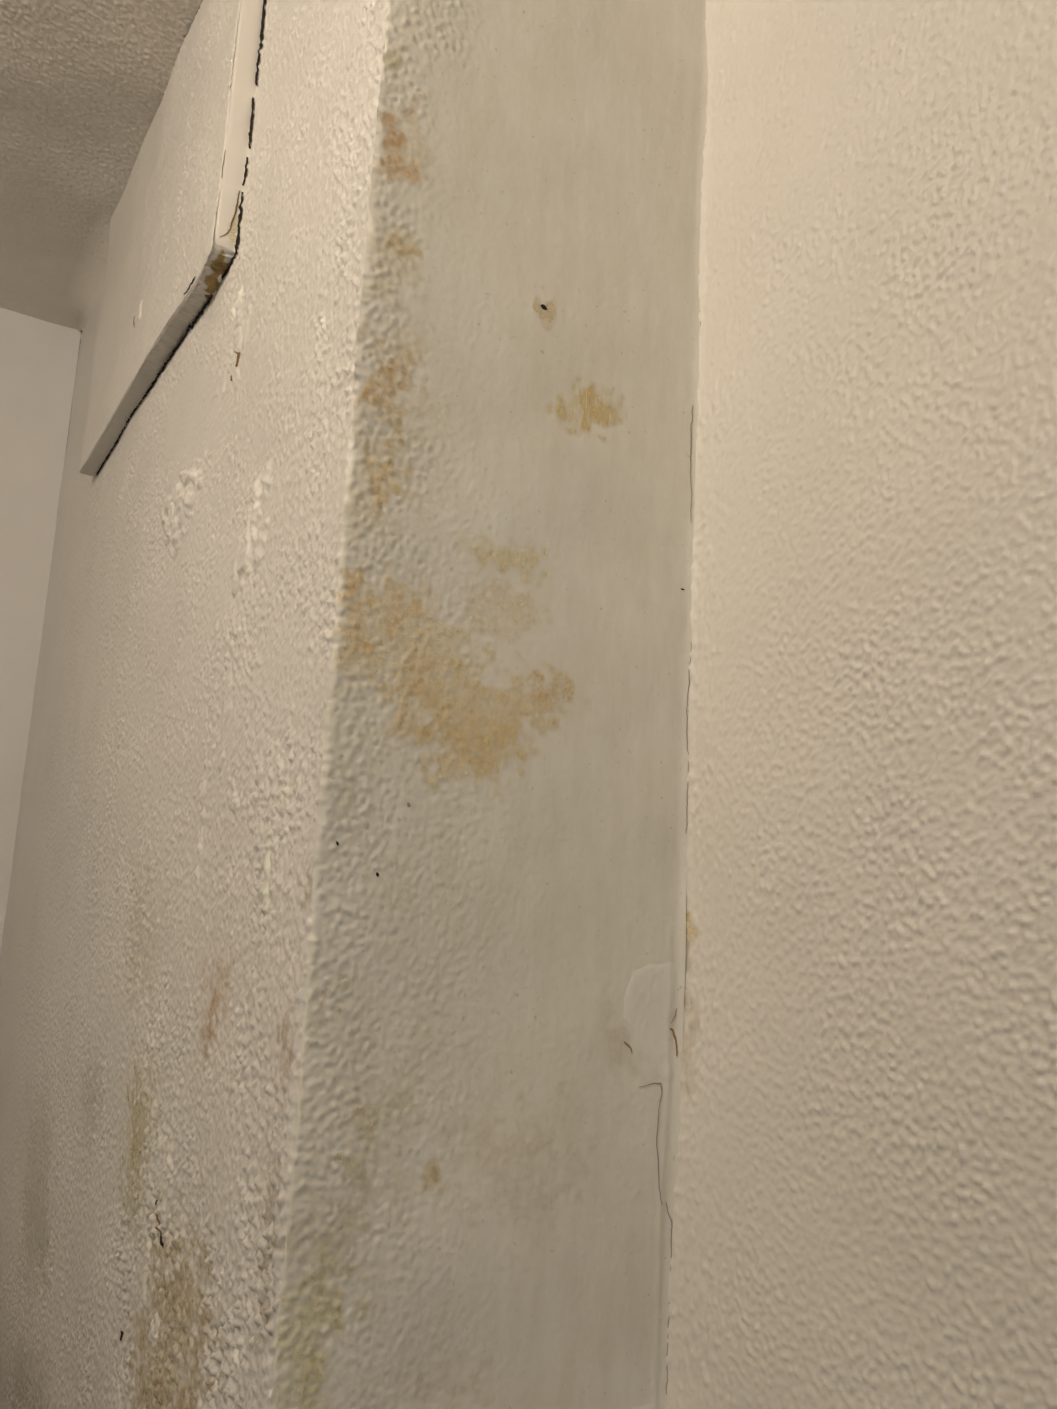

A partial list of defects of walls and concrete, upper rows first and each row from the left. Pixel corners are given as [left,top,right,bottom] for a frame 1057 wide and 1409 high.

crack [96,0,266,475]